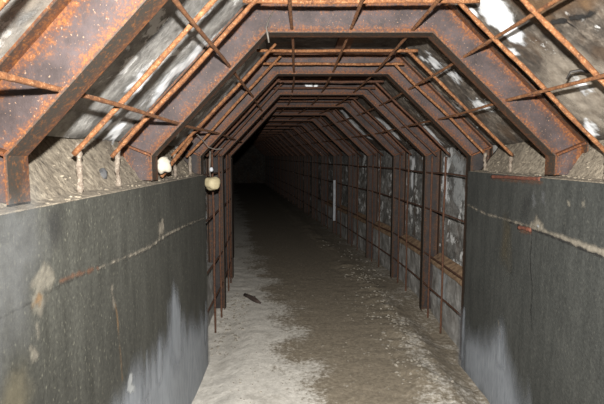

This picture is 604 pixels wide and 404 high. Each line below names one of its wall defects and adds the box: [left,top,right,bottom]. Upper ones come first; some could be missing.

water stain [516,0,593,29]
water stain [543,53,604,136]
crack [100,218,204,268]
crack [467,204,604,280]
efflorescence [123,292,208,404]
efflorescence [461,309,518,404]